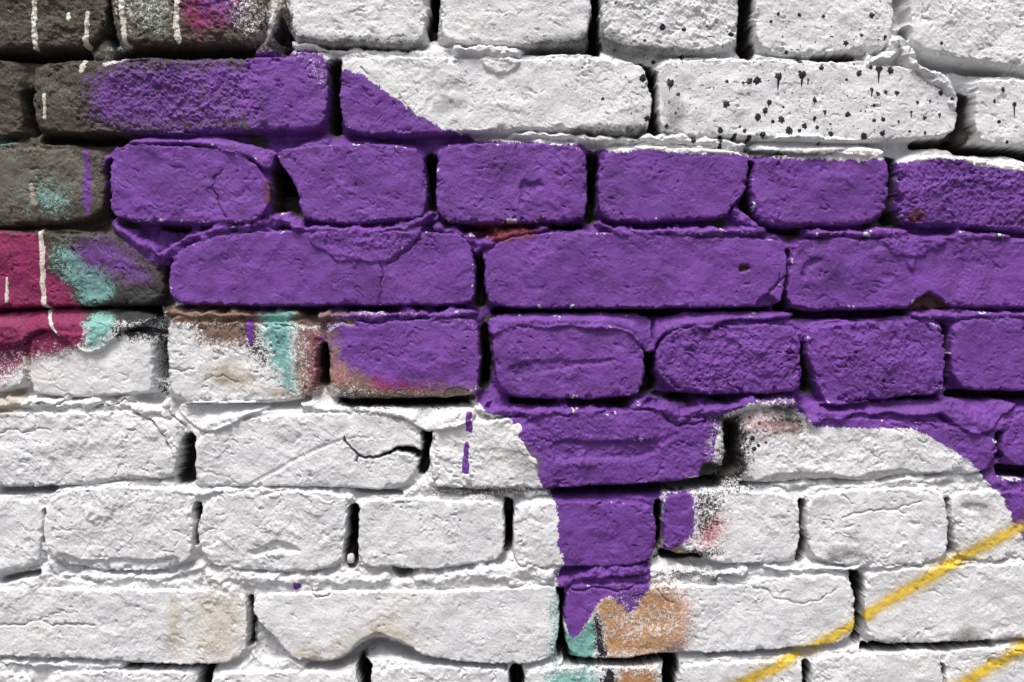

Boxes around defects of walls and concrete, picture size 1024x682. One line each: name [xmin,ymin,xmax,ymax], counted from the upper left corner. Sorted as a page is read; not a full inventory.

crack [198,436,426,486]